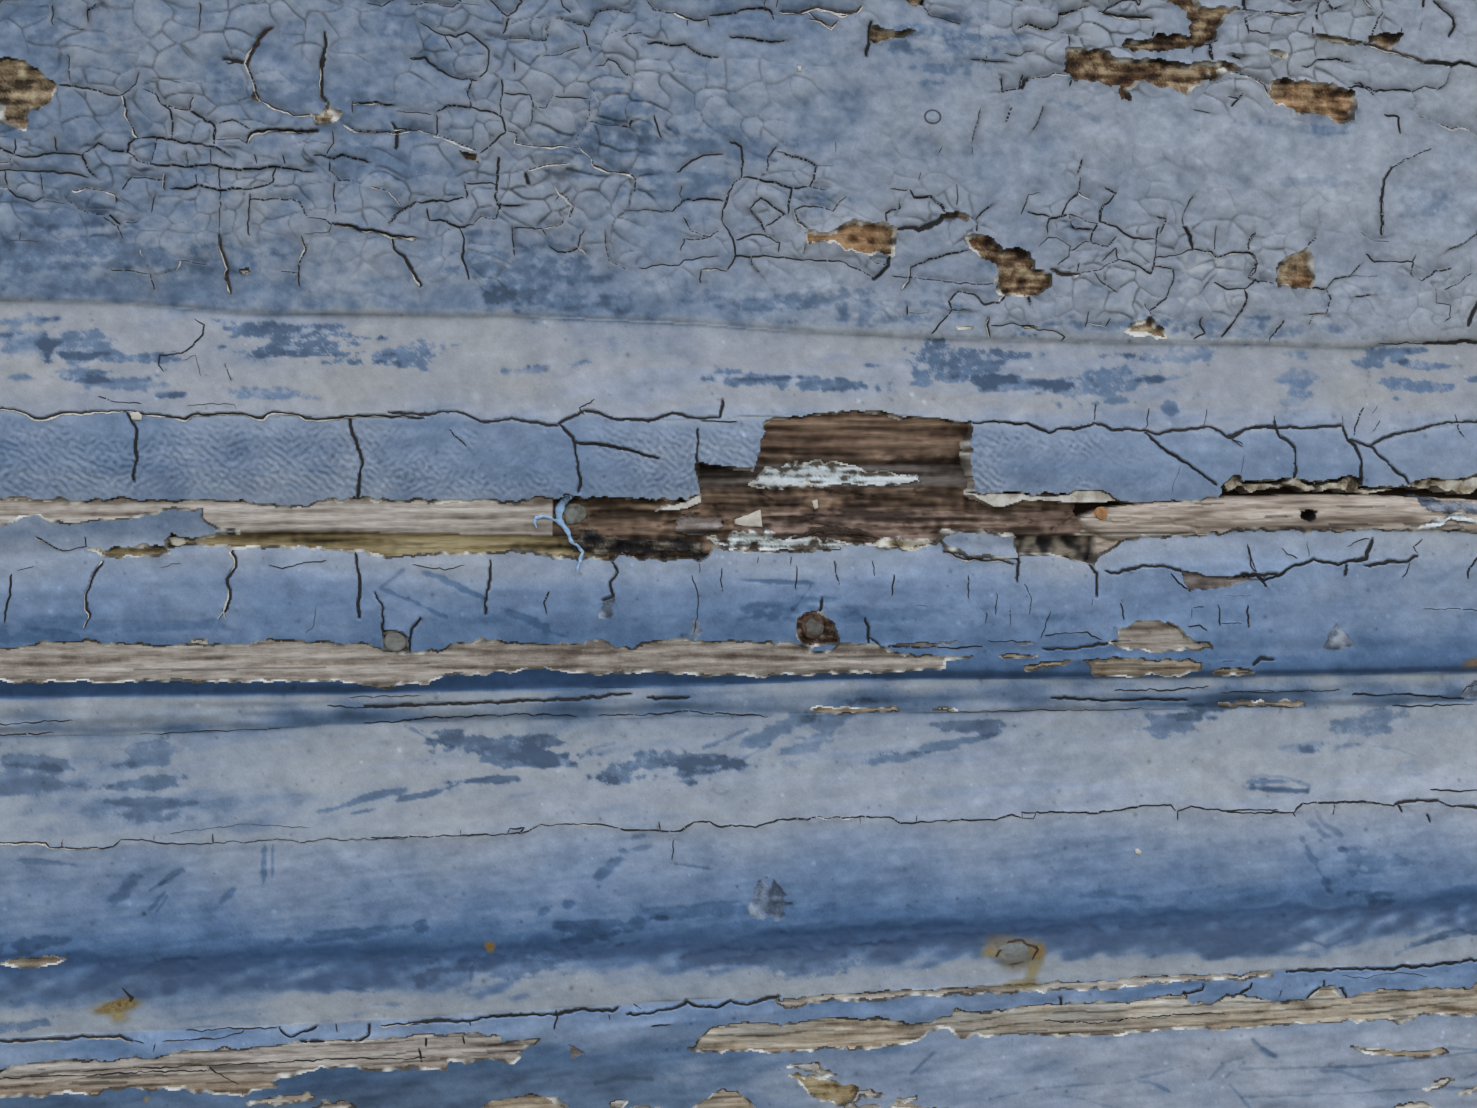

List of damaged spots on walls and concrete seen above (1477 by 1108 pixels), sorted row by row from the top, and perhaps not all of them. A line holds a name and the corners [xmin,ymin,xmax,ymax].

peeling [1064,0,1241,101]
peeling [1268,49,1358,124]
crack [0,0,1317,341]
crack [1192,0,1477,345]
peeling [939,211,1052,297]
crack [0,319,737,499]
peeling [0,410,1477,566]
crack [965,404,1477,490]
peeling [0,610,973,690]
crack [0,789,1477,858]
peeling [0,1032,540,1108]
peeling [687,969,1477,1108]